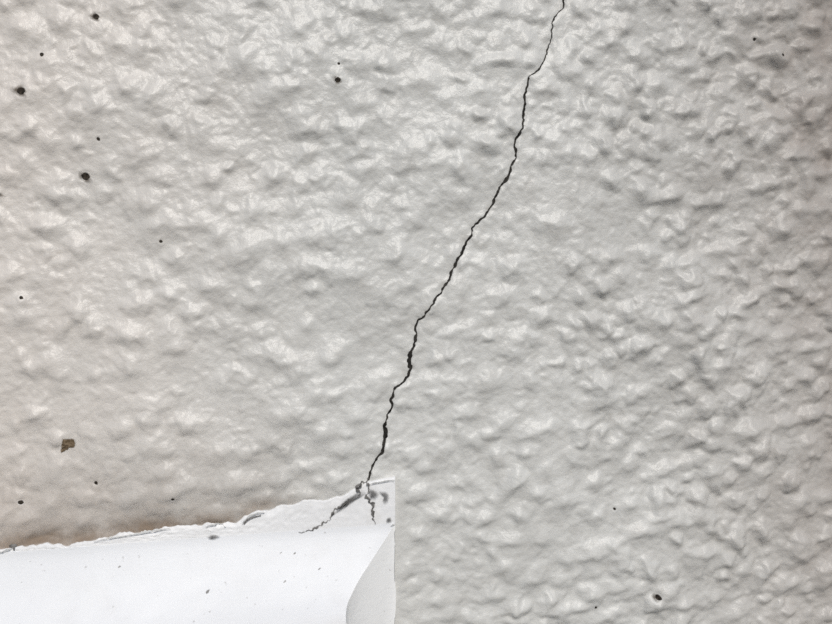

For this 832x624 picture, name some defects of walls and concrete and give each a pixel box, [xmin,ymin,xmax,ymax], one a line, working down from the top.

crack [299,0,565,533]